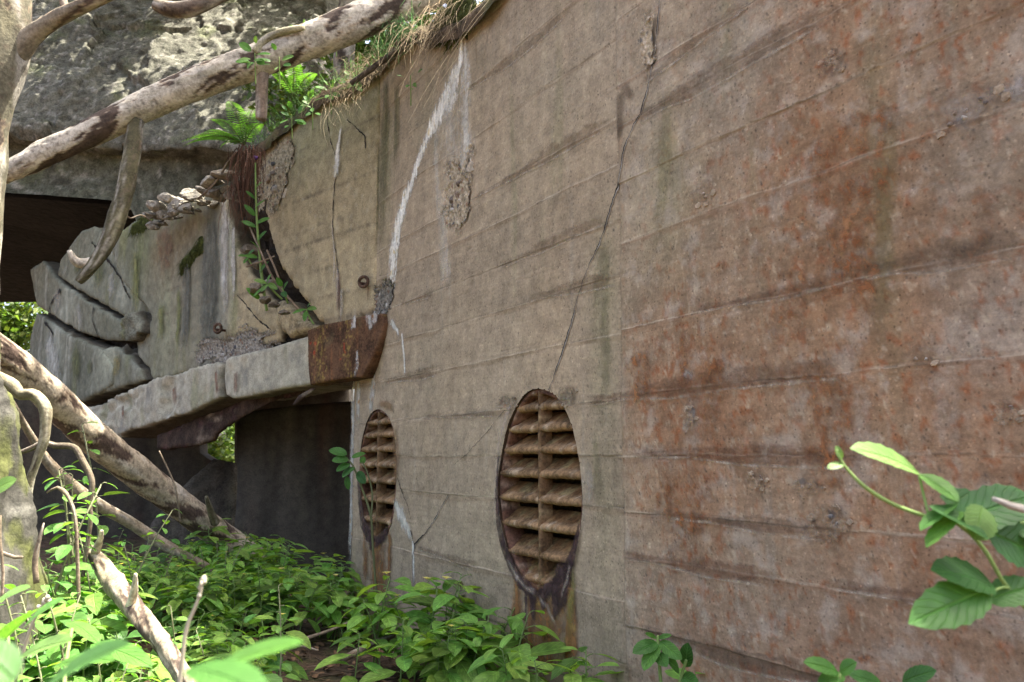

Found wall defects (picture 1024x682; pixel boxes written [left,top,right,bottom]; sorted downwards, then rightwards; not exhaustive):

spalling [638,10,656,70]
spalling [257,130,295,215]
crack [327,119,366,275]
water stain [389,38,485,287]
spalling [439,145,474,236]
crack [548,0,660,390]
corrosion [809,107,896,307]
spalling [372,275,395,315]
corrosion [806,376,851,486]
corrosion [511,582,577,670]